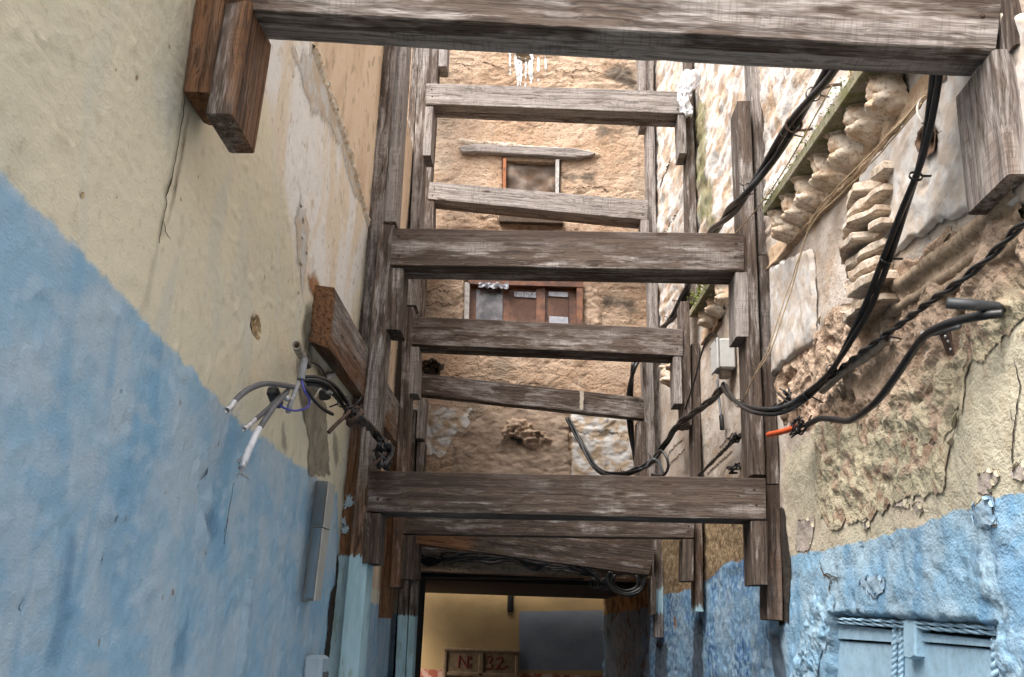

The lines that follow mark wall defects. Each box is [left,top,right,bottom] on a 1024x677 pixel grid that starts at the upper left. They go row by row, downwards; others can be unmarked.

crack [159,100,185,243]
peeling [292,47,362,199]
spalling [774,218,1024,445]
peeling [893,499,924,518]
peeling [971,459,1024,529]